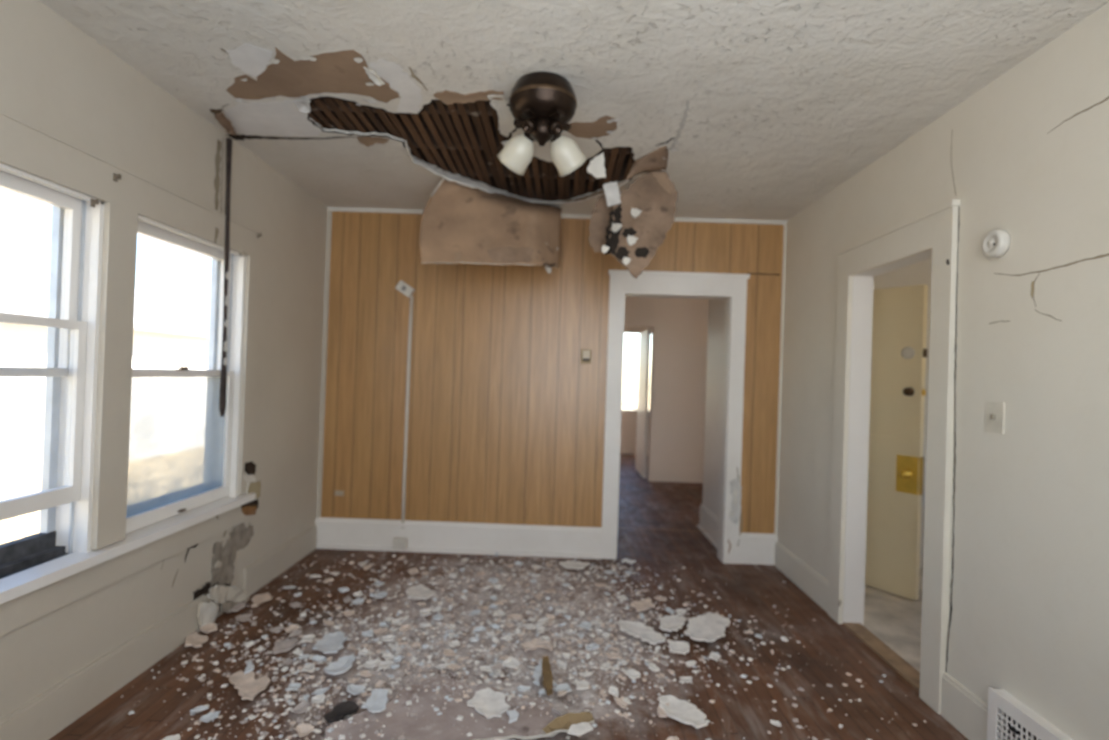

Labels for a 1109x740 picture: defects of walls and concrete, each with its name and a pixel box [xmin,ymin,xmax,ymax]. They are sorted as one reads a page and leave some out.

peeling [221,44,428,137]
peeling [567,115,622,140]
crack [1047,96,1109,134]
crack [995,253,1109,321]
spalling [193,461,261,629]